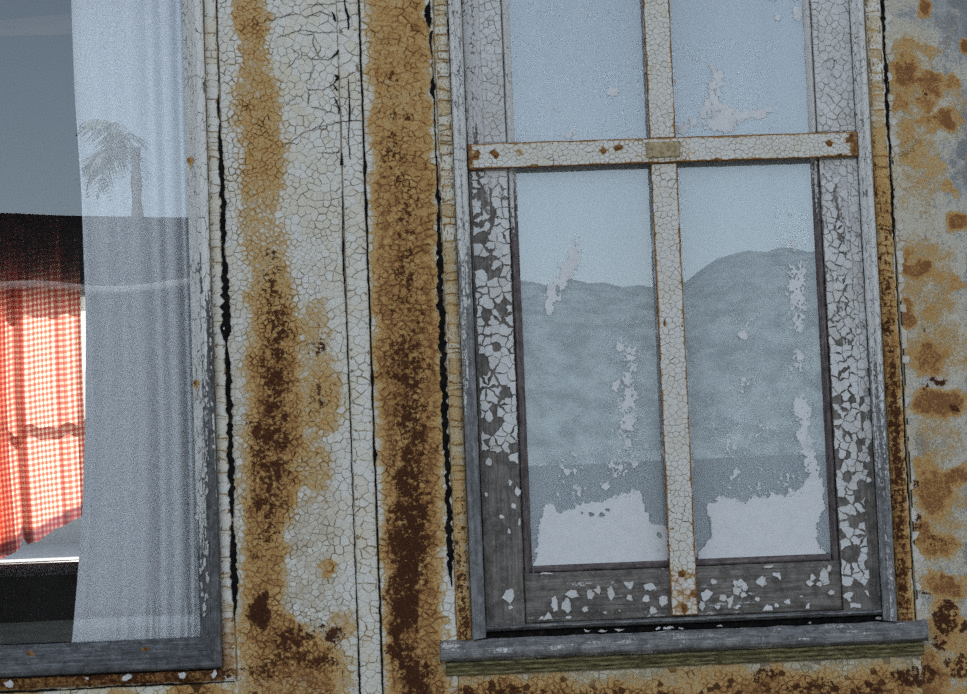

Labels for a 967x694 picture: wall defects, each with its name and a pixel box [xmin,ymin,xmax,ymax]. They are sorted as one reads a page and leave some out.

crack [0,668,235,693]
rust [0,0,357,694]
crack [216,0,239,621]
crack [268,0,384,694]
peeling [471,170,518,466]
peeling [502,589,514,610]
peeling [499,480,521,534]
peeling [539,581,668,620]
rust [361,0,967,694]
peeling [694,159,872,612]
crack [880,0,916,619]